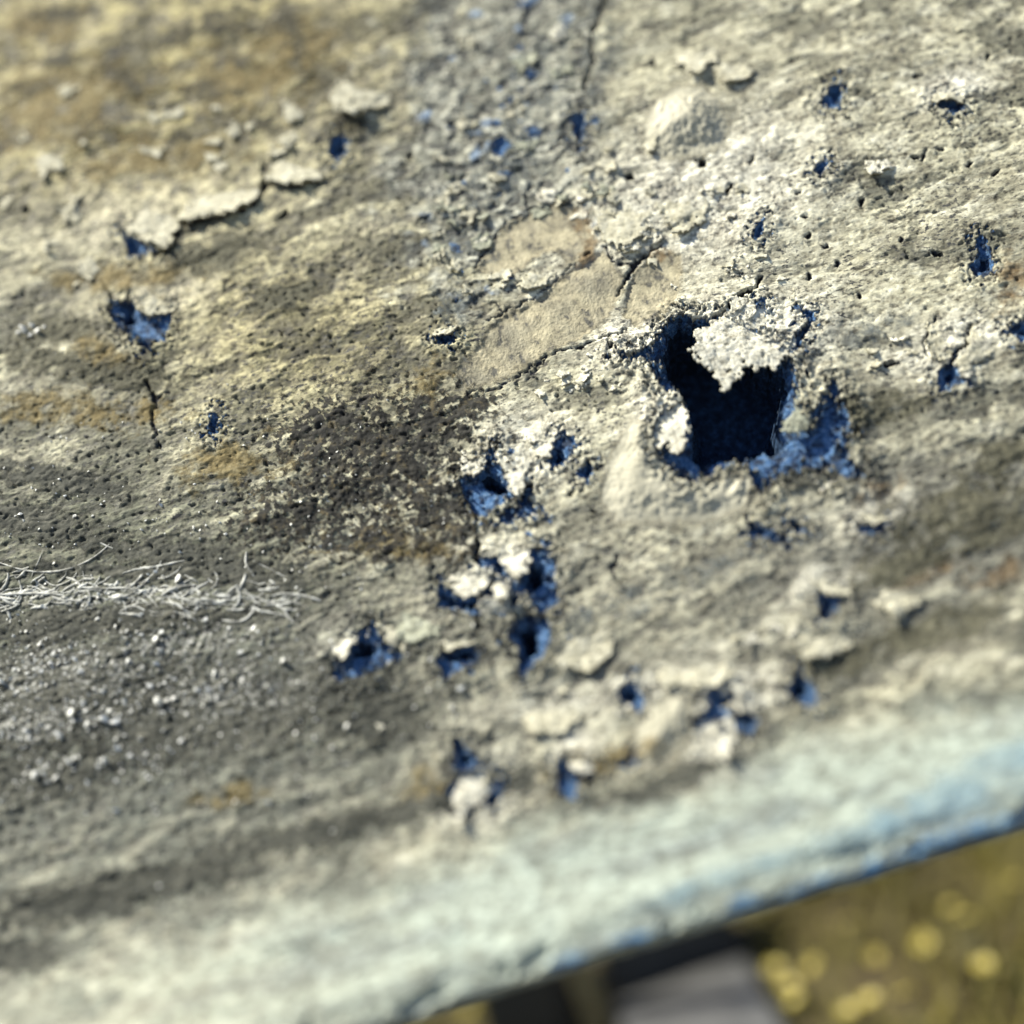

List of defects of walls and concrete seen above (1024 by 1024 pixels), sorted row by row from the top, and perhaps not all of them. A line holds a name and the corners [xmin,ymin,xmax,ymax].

crack [579,0,606,91]
peeling [109,80,391,267]
hole [100,287,181,367]
crack [476,191,574,268]
crack [490,264,576,317]
crack [473,330,627,393]
crack [604,246,661,296]
spalling [418,145,874,556]
peeling [865,315,1024,403]
crack [145,381,171,449]
spalling [326,423,614,691]
spalling [436,717,519,824]